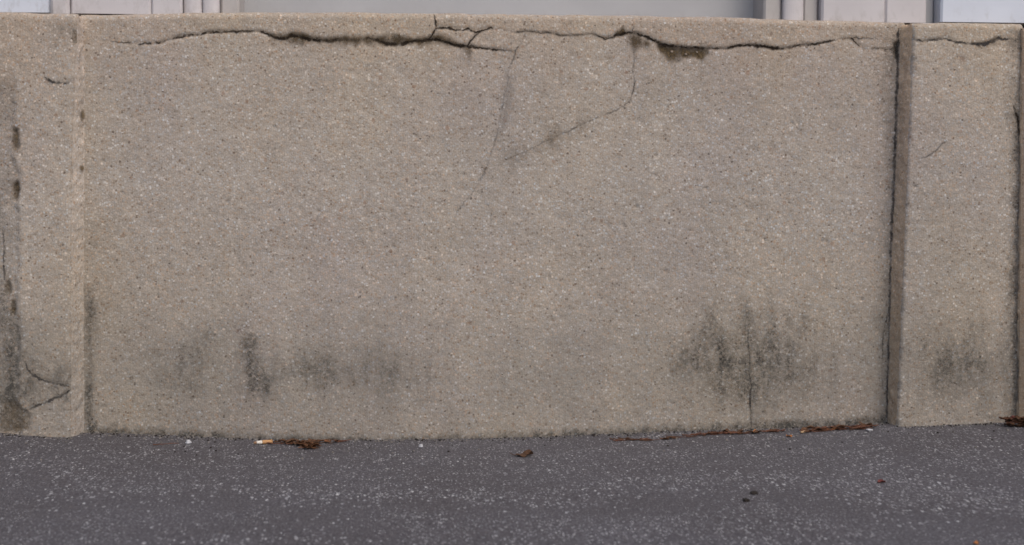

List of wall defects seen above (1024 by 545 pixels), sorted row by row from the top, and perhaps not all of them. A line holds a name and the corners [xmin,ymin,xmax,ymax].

crack [115,30,336,45]
crack [367,15,1008,414]
crack [26,364,70,408]